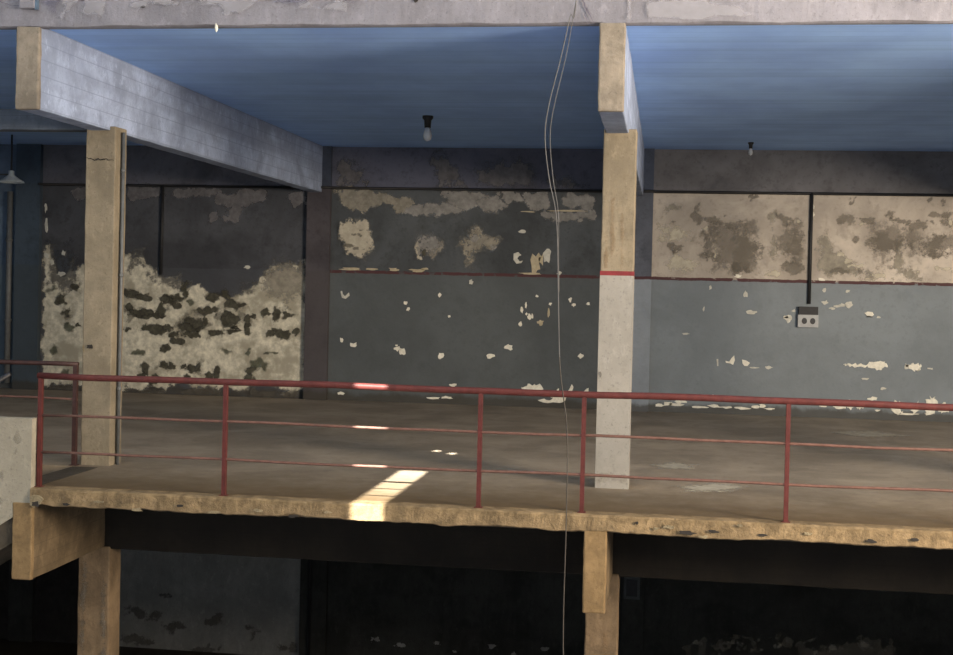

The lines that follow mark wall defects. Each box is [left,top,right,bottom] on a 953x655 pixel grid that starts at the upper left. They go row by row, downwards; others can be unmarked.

peeling [127,183,268,223]
peeling [334,186,597,223]
peeling [513,249,551,275]
peeling [40,204,93,390]
peeling [518,295,552,326]
peeling [122,251,306,398]
peeling [843,361,888,380]
peeling [904,363,933,372]
peeling [521,384,573,403]
peeling [656,400,775,410]
peeling [820,387,886,412]
peeling [892,397,949,415]